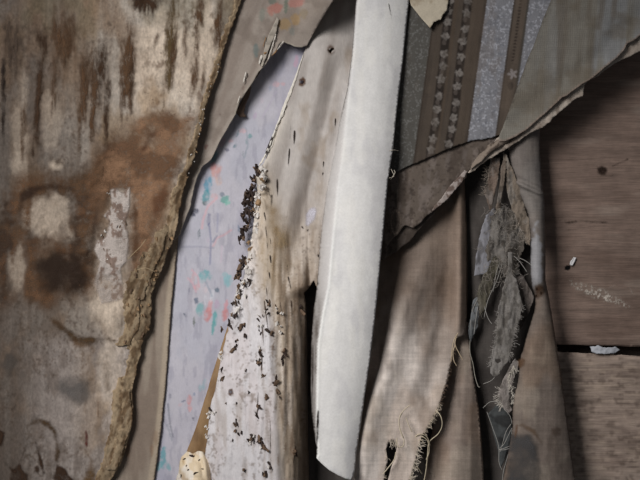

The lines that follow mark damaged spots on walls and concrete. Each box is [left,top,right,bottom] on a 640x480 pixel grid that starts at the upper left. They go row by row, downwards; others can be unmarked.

leakage [34,18,75,143]
leakage [119,30,135,111]
leakage [134,0,157,13]
leakage [165,0,186,89]
leakage [191,59,204,89]
leakage [194,0,204,49]
leakage [214,1,222,47]
leakage [0,49,193,308]
peeling [95,0,241,480]
leakage [52,320,95,345]